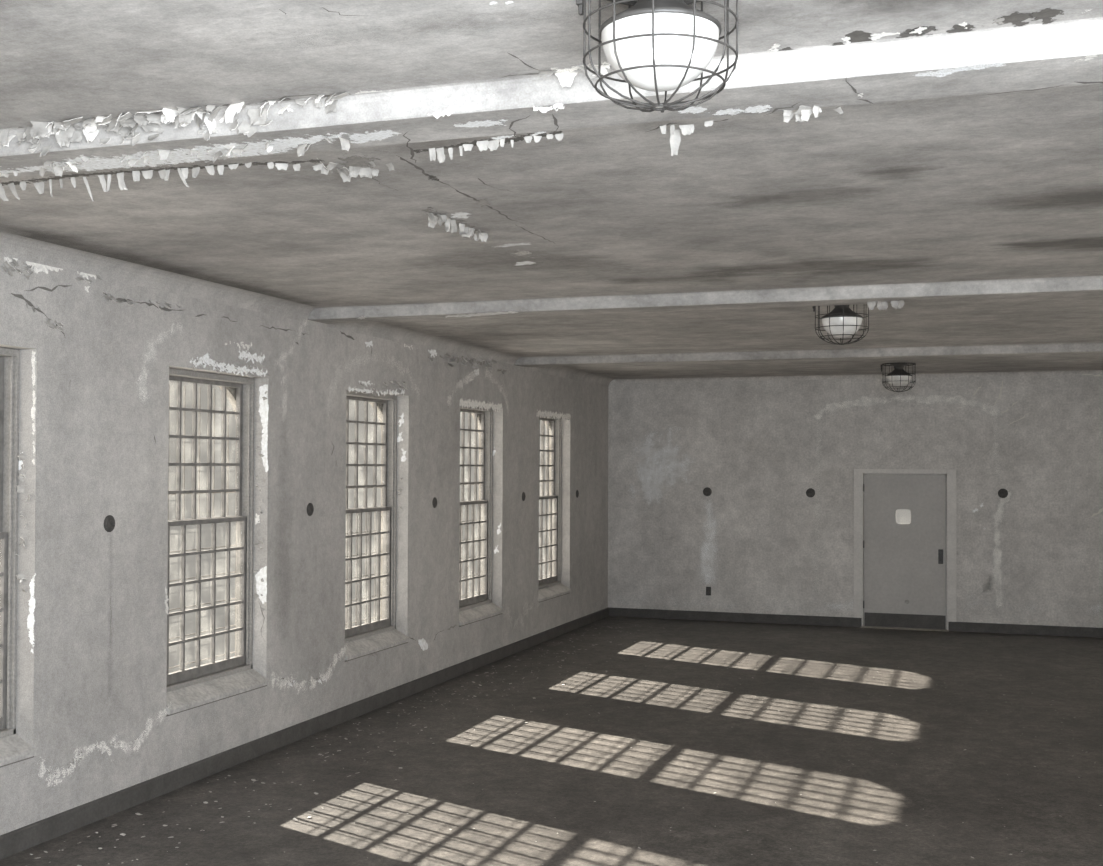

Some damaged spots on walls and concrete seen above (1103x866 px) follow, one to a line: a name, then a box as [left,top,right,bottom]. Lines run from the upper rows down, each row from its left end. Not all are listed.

peeling [833,22,976,46]
peeling [993,8,1064,27]
crack [980,82,1103,96]
peeling [0,90,401,202]
peeling [413,106,564,163]
crack [509,114,559,137]
peeling [647,103,843,156]
crack [396,132,554,243]
peeling [424,207,533,266]
peeling [190,320,309,524]
peeling [16,571,36,653]
peeling [253,566,267,641]